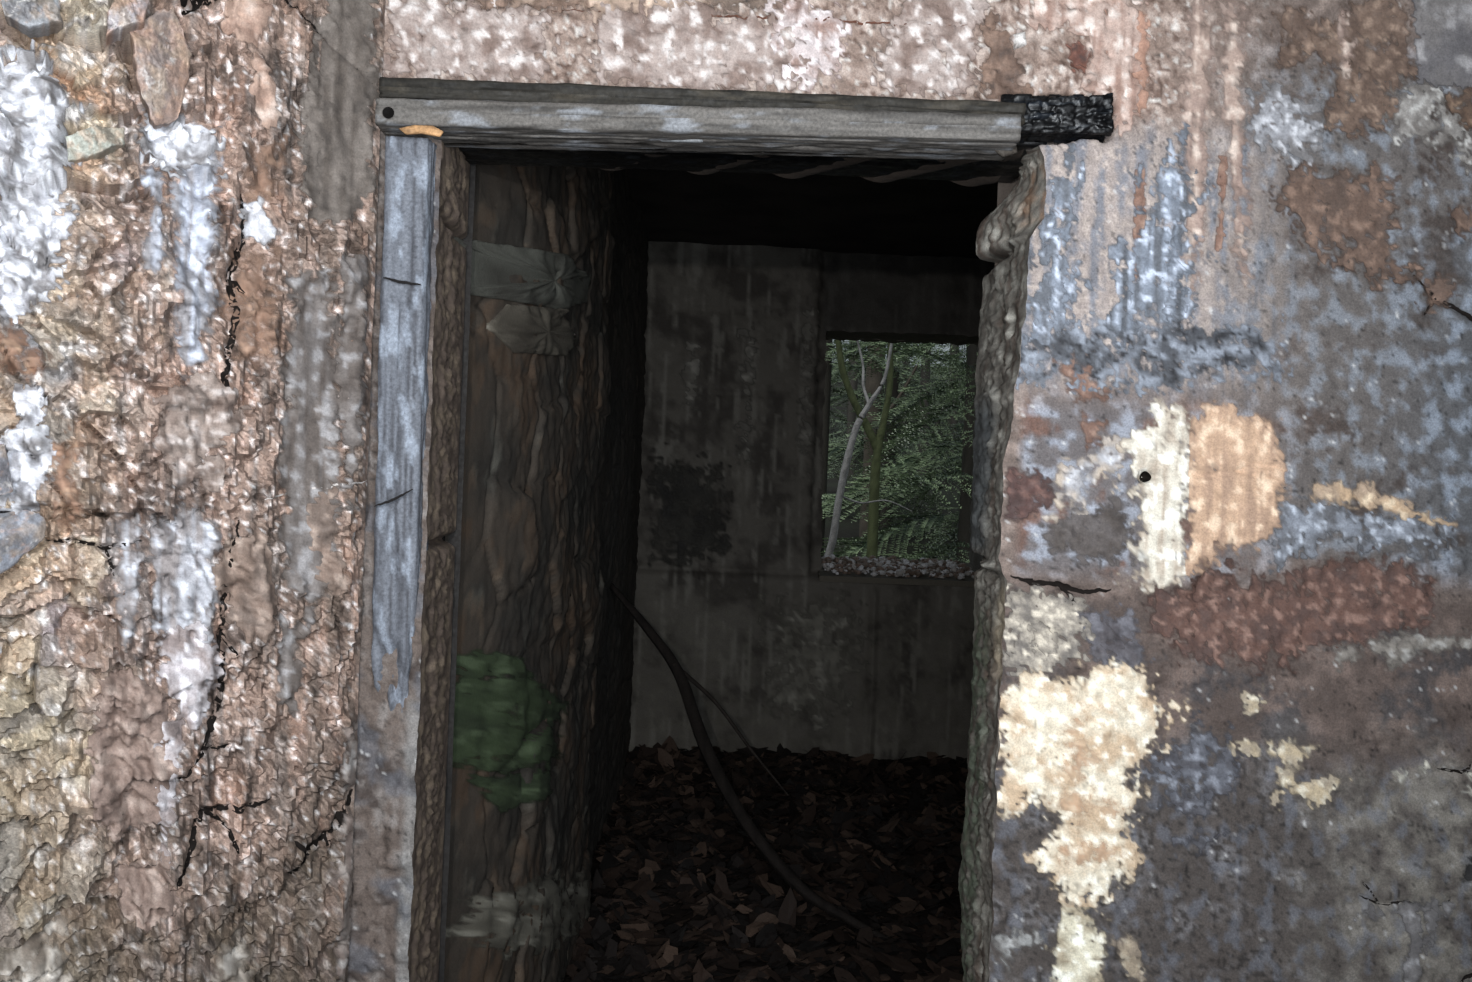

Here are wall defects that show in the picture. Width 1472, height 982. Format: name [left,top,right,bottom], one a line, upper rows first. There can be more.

efflorescence [0,39,84,324]
efflorescence [135,110,228,380]
efflorescence [238,196,280,249]
peeling [220,0,1156,225]
efflorescence [114,496,226,863]
crack [1010,575,1111,605]